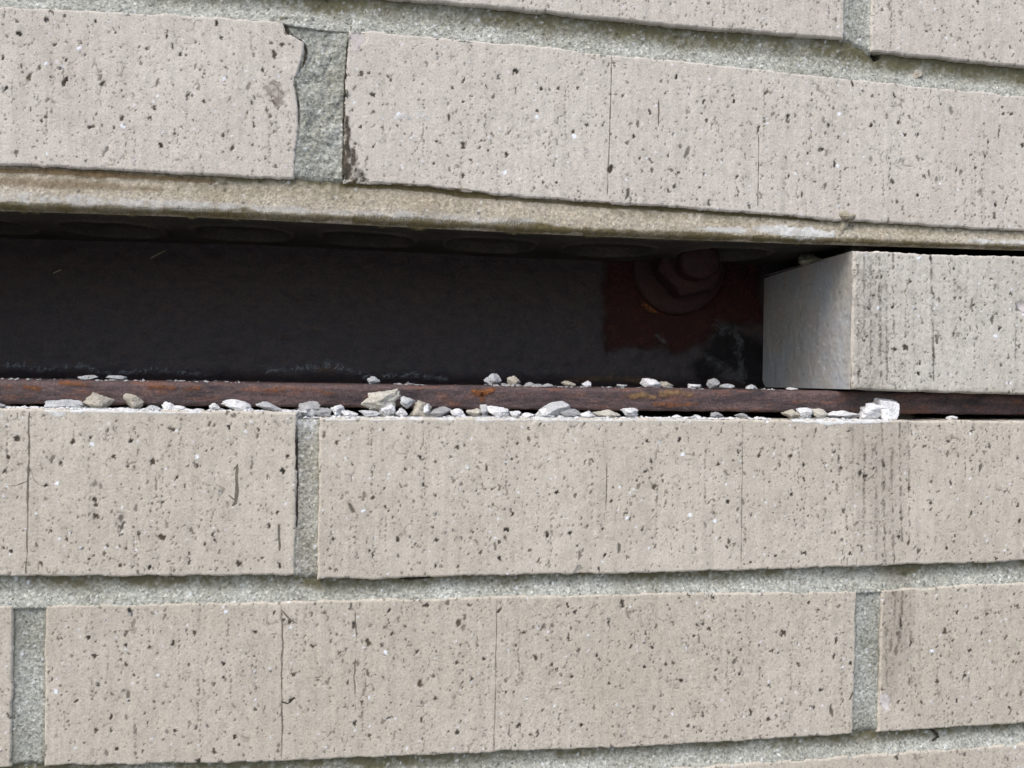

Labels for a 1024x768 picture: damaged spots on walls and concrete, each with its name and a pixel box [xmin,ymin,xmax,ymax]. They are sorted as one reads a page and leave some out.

peeling [694,325,765,389]